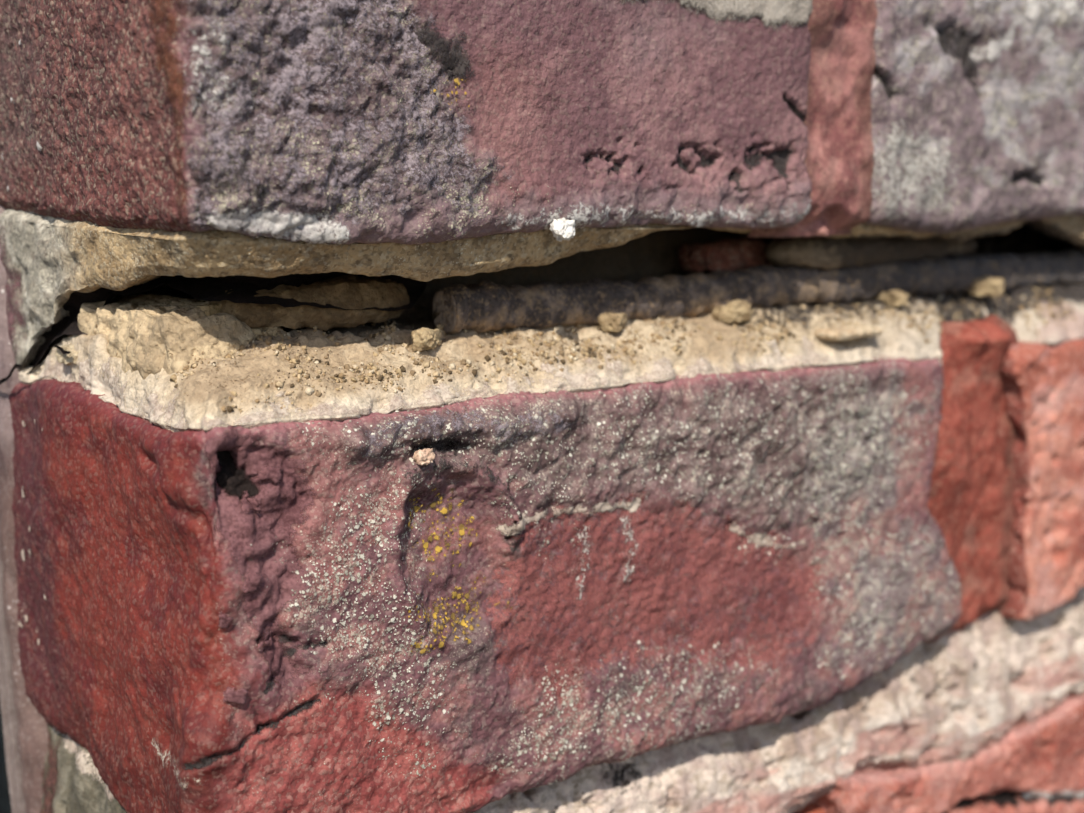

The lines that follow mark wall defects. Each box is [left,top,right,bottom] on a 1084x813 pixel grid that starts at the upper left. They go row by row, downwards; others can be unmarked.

spalling [765,236,978,270]
spalling [877,290,910,307]
spalling [969,276,1004,297]
crack [0,272,427,385]
spalling [410,327,442,352]
spalling [598,312,627,333]
spalling [712,300,753,325]
peeling [814,324,883,341]
spalling [55,343,80,366]
crack [183,634,327,770]
crack [946,789,1084,813]